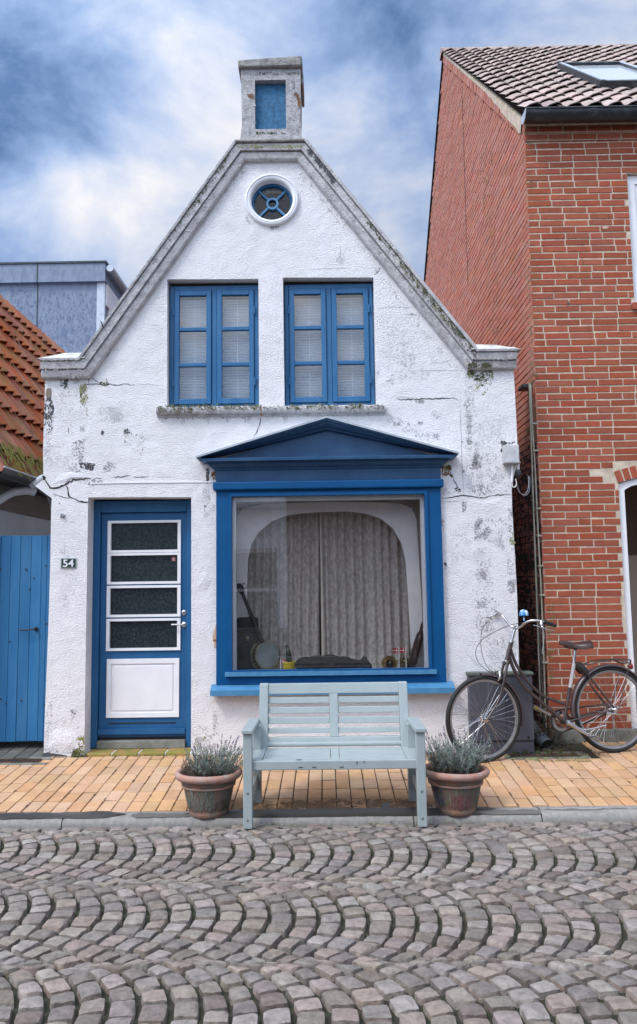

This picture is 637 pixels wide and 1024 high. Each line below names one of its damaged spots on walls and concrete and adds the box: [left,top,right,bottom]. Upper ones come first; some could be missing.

water stain [10,155,245,485]
water stain [298,121,518,512]
crack [45,471,149,523]
crack [398,397,510,502]
mould [447,508,516,671]